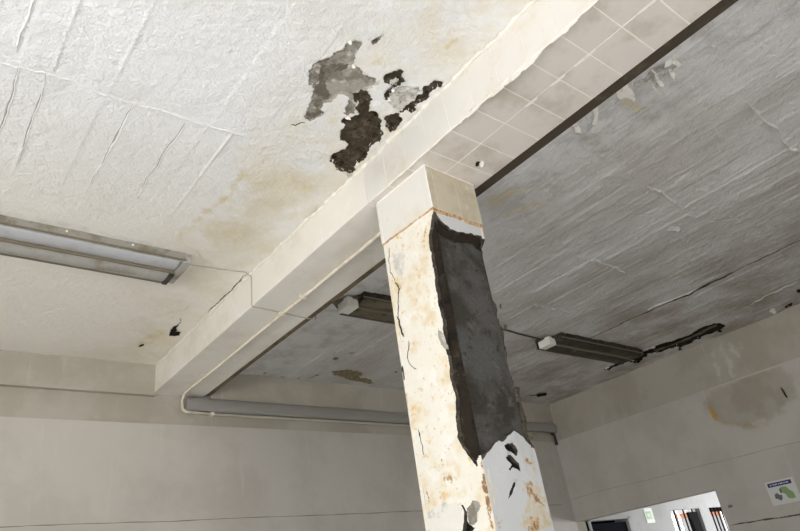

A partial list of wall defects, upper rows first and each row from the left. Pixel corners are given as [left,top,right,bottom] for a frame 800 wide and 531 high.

crack [0,68,20,132]
crack [16,75,47,170]
flaking render [304,35,443,173]
water stain [0,129,350,264]
rust [419,219,430,254]
crack [388,253,416,380]
flaking render [432,220,533,471]
flaking render [604,323,725,371]
crack [591,240,800,338]
water stain [698,338,800,436]
flaking render [426,500,481,531]
rust [423,446,554,531]